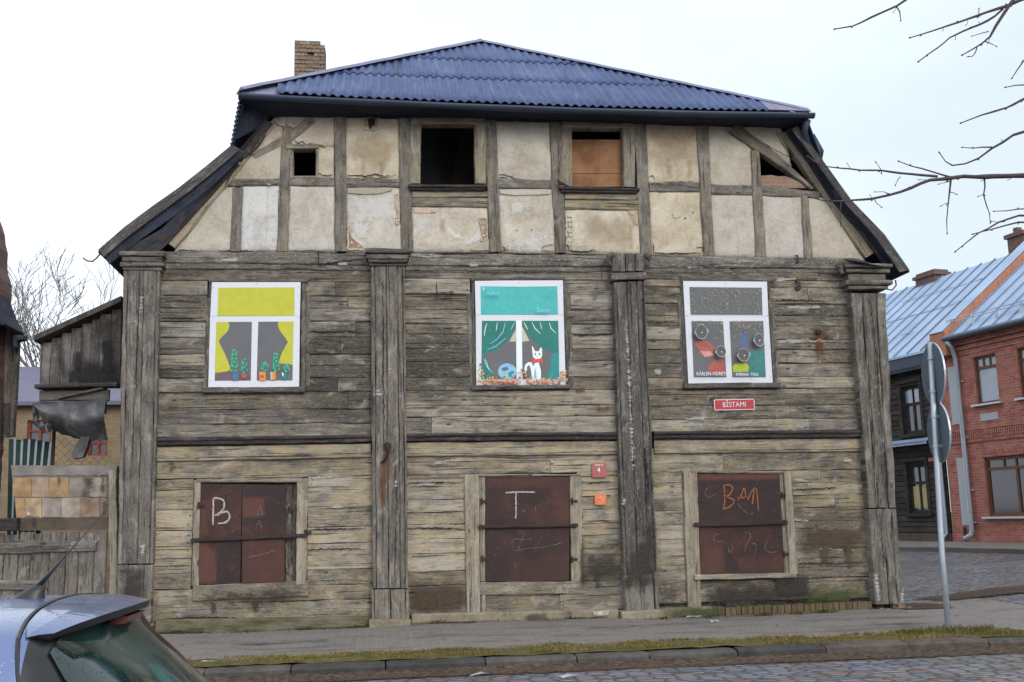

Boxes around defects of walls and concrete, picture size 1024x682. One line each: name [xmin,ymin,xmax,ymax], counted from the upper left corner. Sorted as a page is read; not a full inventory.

crack [319,172,394,180]
spalling [338,227,364,265]
spalling [478,217,488,242]
spalling [565,215,574,246]